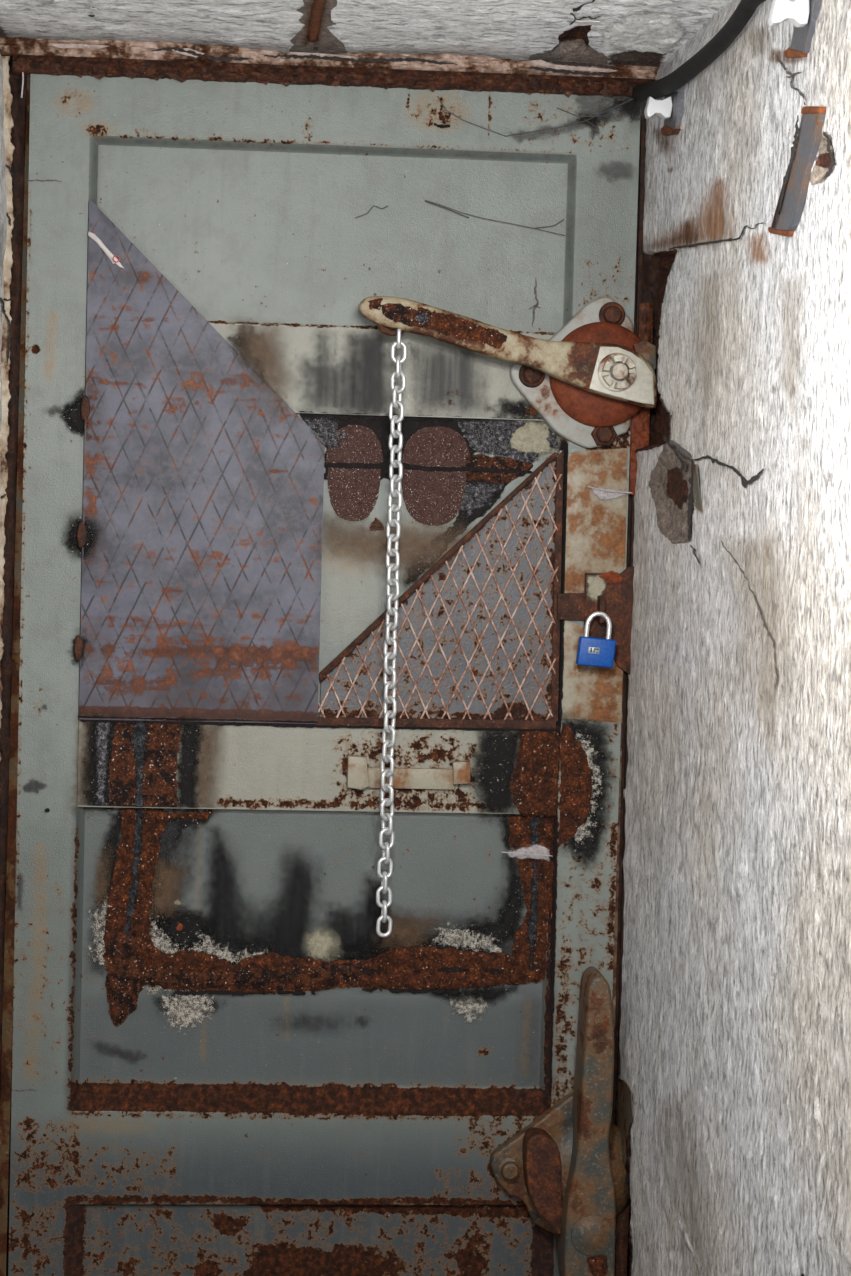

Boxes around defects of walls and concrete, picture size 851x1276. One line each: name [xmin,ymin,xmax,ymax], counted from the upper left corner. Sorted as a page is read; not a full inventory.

crack [88,0,103,22]
spalling [288,0,360,58]
crack [0,297,13,366]
spalling [635,249,703,565]
crack [693,455,764,488]
rust [599,571,623,583]
rust [103,718,593,1026]